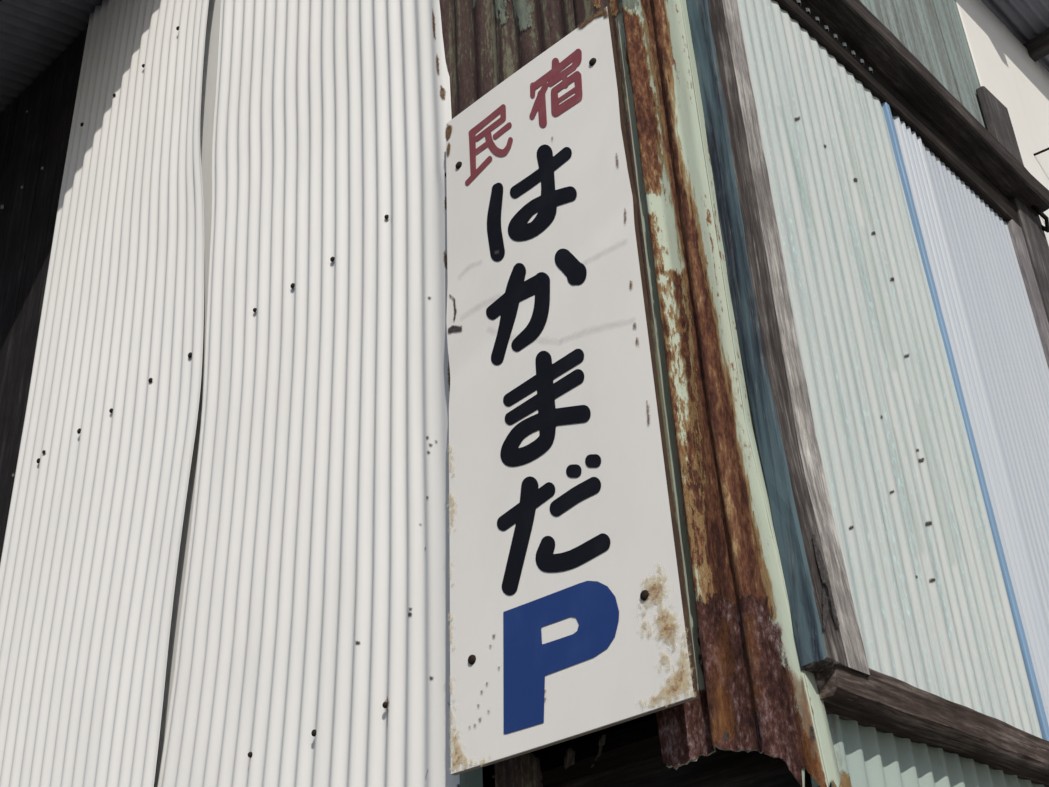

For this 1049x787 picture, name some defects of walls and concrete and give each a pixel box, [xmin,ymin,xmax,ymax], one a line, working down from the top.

peeling [494,0,535,31]
spalling [577,7,609,28]
rust [439,0,852,787]